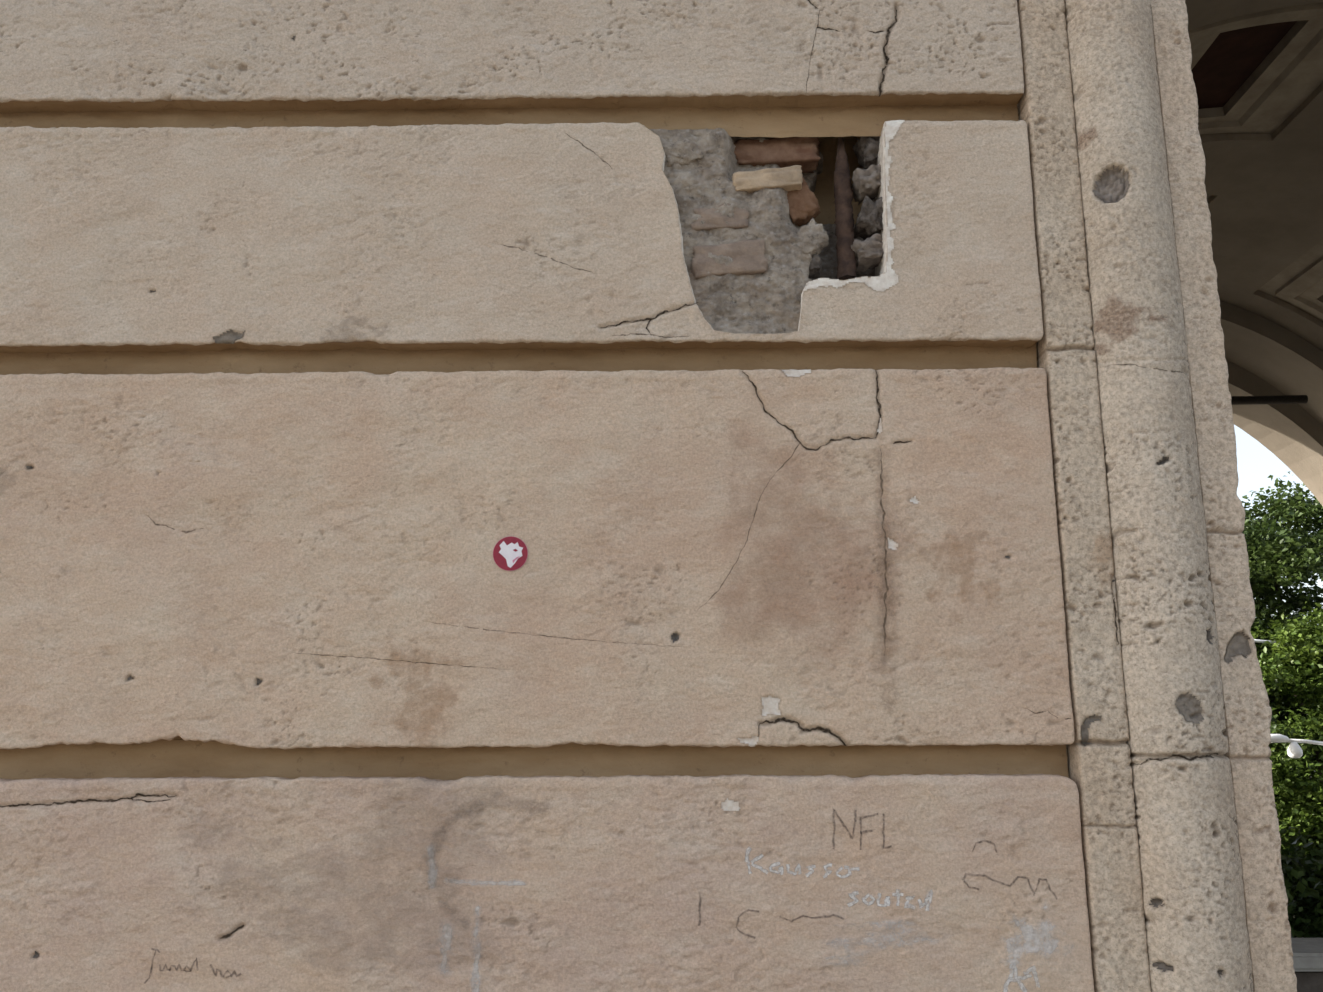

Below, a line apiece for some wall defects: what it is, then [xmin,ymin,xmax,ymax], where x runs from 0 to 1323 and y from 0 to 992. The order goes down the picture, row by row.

crack [806,0,897,96]
spalling [641,120,905,335]
crack [601,302,698,338]
crack [704,372,911,656]
spalling [1224,632,1251,664]
spalling [1175,692,1205,724]
crack [758,717,846,746]